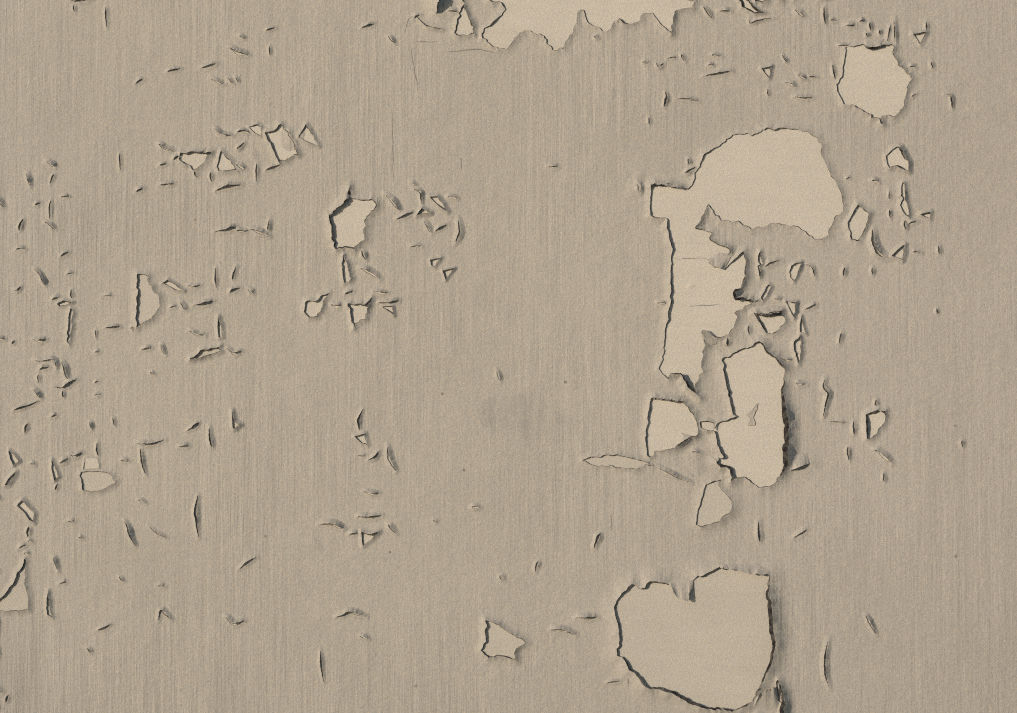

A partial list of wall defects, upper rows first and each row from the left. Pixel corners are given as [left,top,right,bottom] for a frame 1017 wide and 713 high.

peeling [418,0,703,59]
peeling [828,16,920,133]
peeling [132,118,323,196]
peeling [868,142,936,228]
peeling [298,178,461,335]
peeling [29,264,82,421]
peeling [102,266,258,366]
peeling [638,119,910,539]
peeling [0,447,106,527]
peeling [0,540,70,622]
peeling [473,612,534,668]
peeling [546,548,796,713]